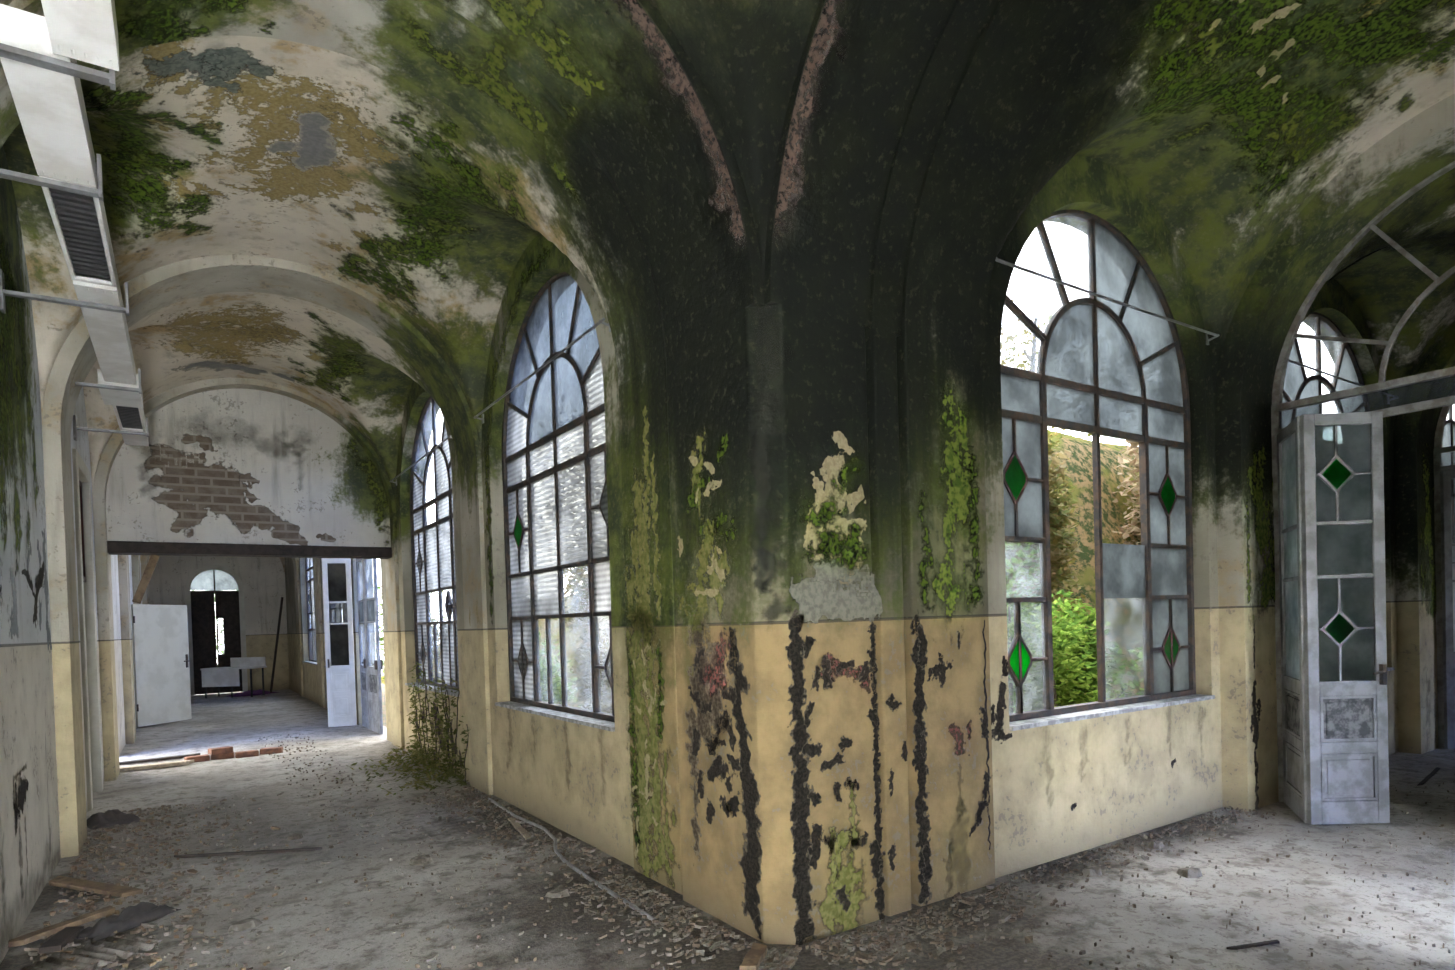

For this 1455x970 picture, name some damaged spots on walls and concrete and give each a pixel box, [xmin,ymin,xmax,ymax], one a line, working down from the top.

damp [135,47,274,93]
peeling [125,41,412,254]
peeling [141,303,331,382]
flaking render [144,434,336,545]
peeling [803,431,867,585]
spalling [13,764,29,835]
damp [627,643,640,849]
peeling [631,739,672,858]
damp [656,646,665,739]
flaking render [685,546,763,940]
peeling [785,610,961,946]
peeling [969,771,993,837]